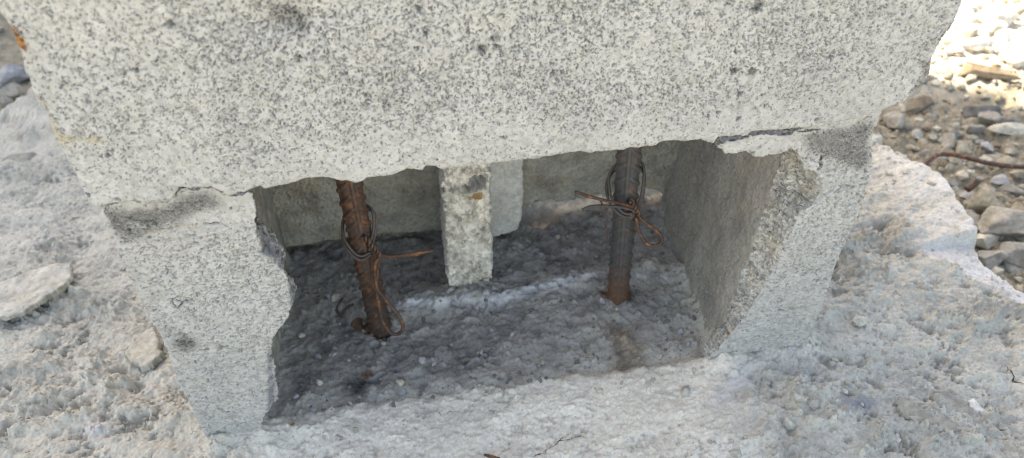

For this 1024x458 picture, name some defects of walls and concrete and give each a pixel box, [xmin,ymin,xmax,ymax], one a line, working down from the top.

crack [717,129,823,170]
spalling [449,175,487,193]
spalling [607,147,643,305]
spalling [259,229,286,267]
spalling [333,178,392,339]